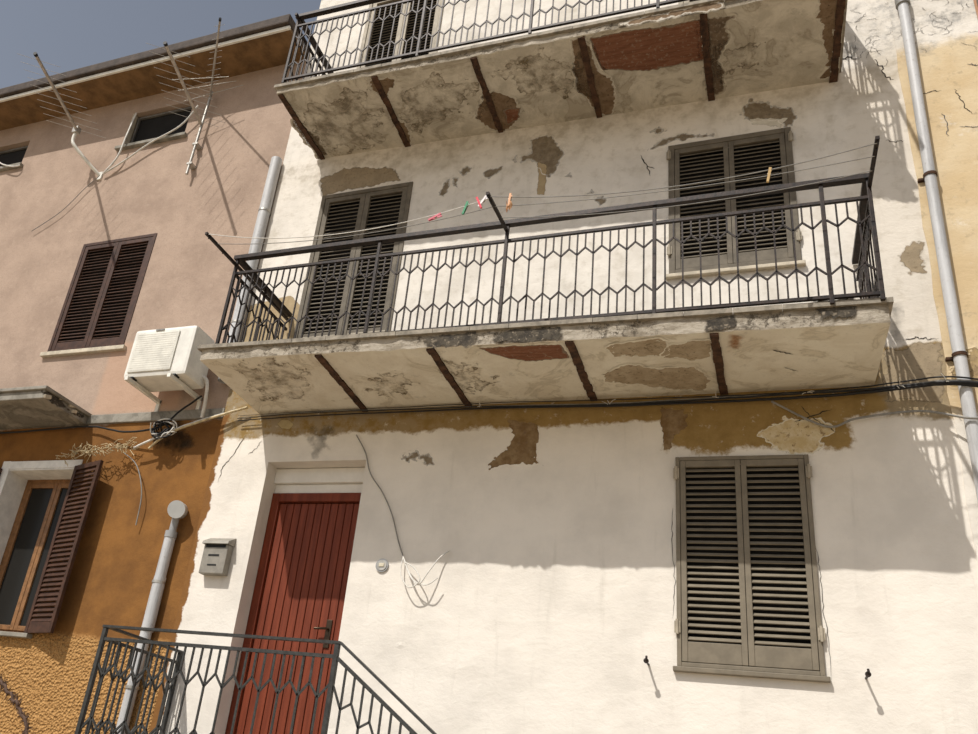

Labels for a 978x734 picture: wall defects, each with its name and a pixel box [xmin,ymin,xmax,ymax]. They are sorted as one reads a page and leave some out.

flaking render [568,1,738,116]